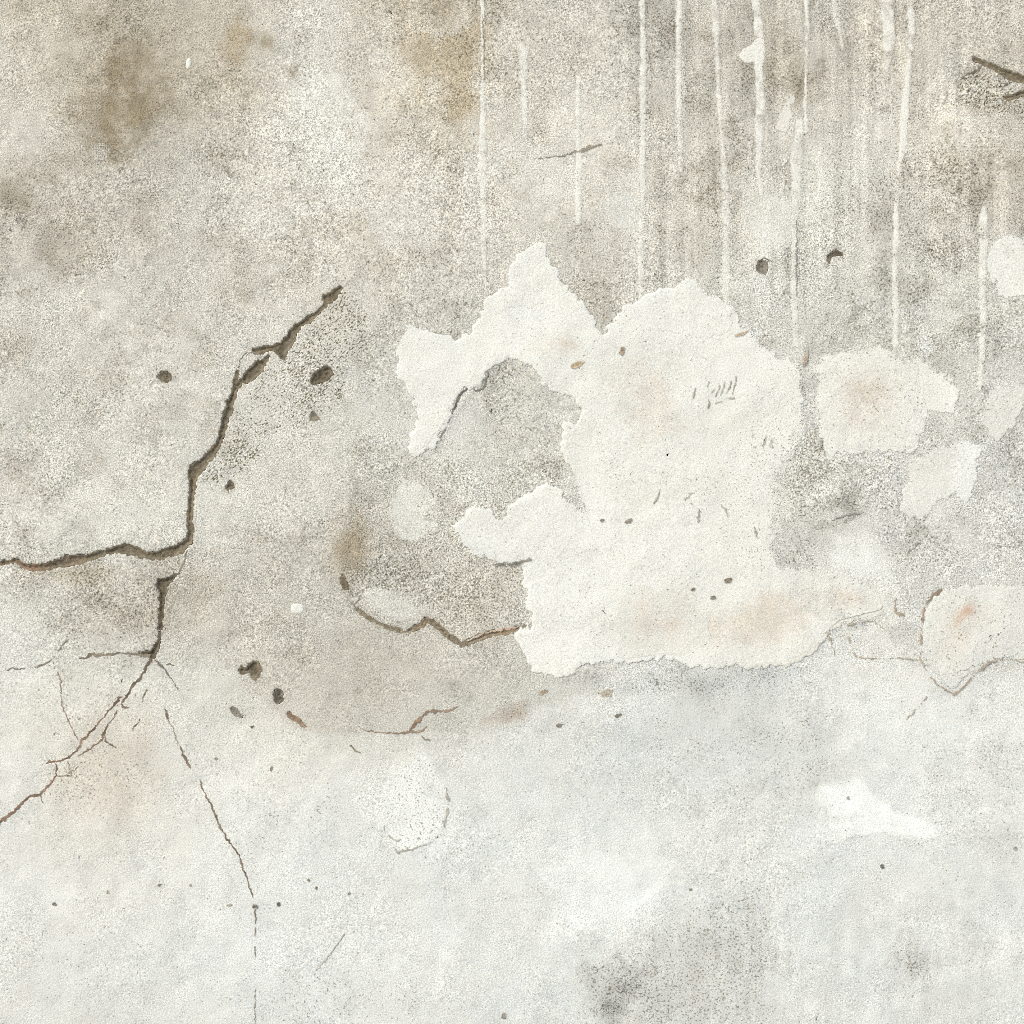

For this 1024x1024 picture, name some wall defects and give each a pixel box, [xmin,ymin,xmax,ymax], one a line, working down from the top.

water stain [771,45,822,114]
crack [960,56,1024,102]
crack [534,144,602,159]
flaking render [385,240,983,678]
crack [493,558,531,566]
crack [350,598,527,647]
crack [0,286,344,1020]
crack [825,588,1023,721]
crack [350,706,458,753]